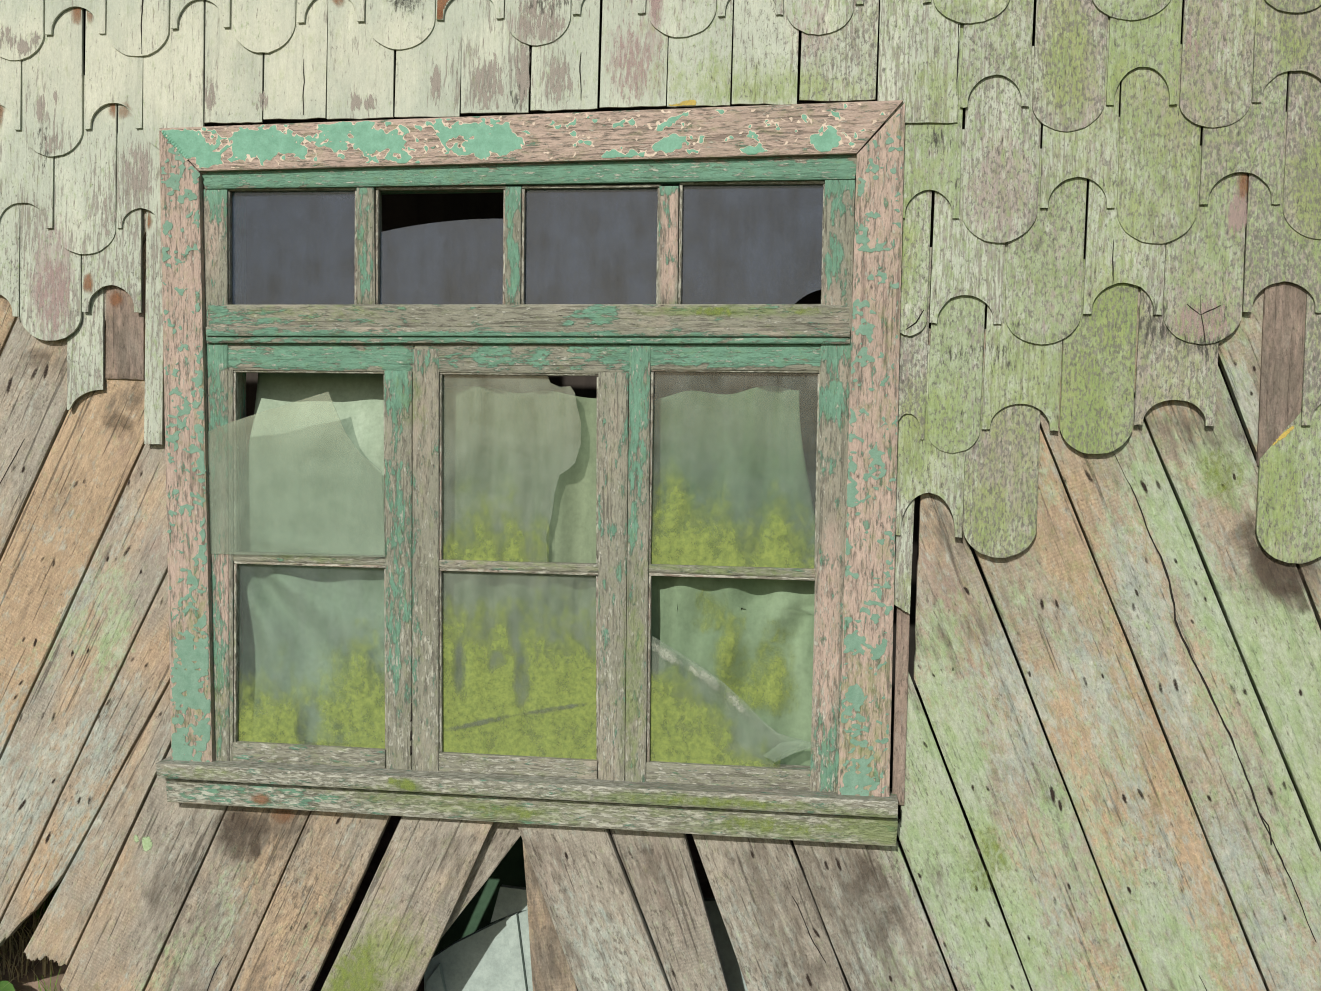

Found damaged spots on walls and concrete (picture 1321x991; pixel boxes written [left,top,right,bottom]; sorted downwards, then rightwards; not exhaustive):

peeling [100,0,705,314]
peeling [724,103,903,397]
peeling [164,309,211,762]
peeling [839,408,898,797]
crack [1114,454,1316,942]